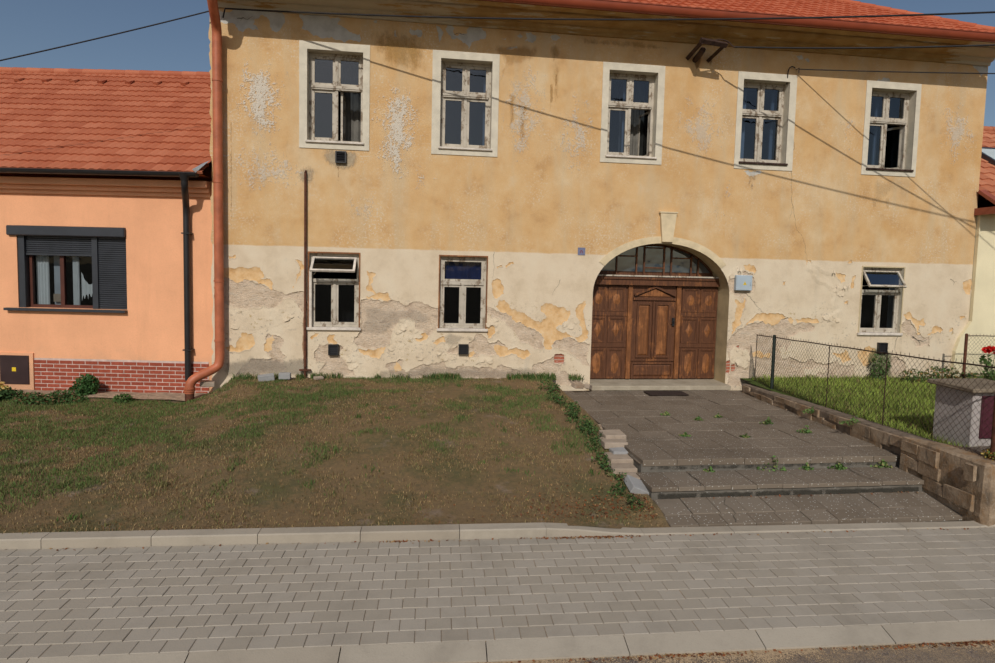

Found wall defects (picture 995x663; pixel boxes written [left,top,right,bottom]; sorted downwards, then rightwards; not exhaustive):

crack [790,173,850,309]
flaking render [212,255,308,312]
flaking render [224,332,287,377]
flaking render [310,260,590,387]
flaking render [725,264,876,387]
flaking render [886,355,907,378]
flaking render [901,312,966,347]